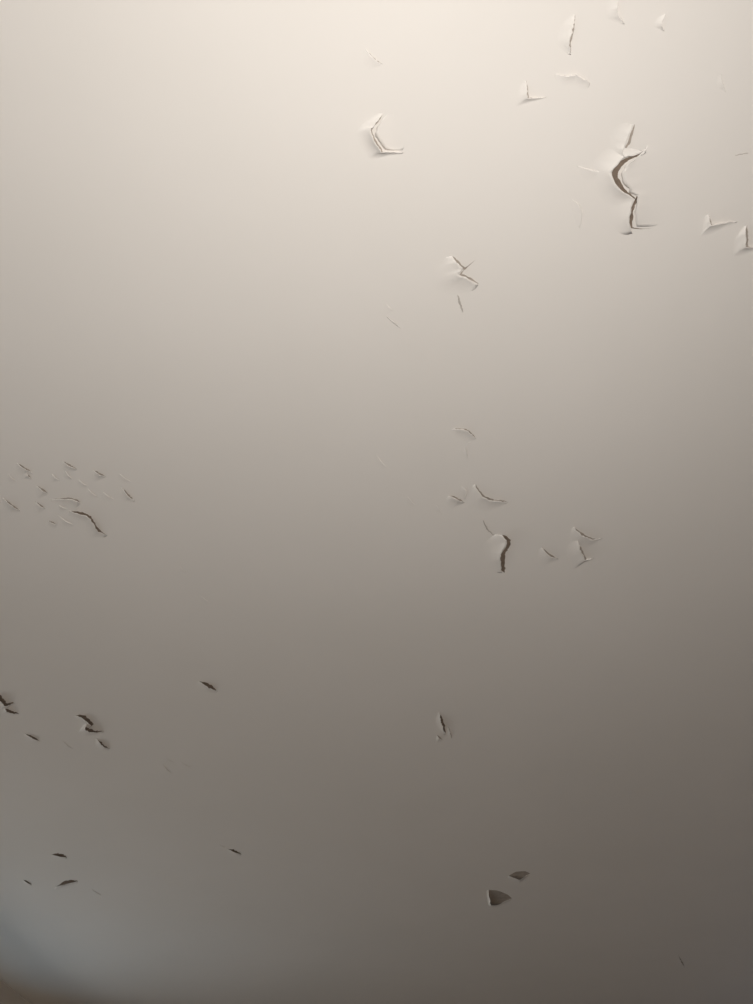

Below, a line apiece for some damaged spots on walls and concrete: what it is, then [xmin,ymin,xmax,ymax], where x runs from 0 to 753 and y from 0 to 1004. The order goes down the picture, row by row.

peeling [356,113,407,159]
peeling [577,123,672,235]
peeling [700,215,753,256]
peeling [430,256,479,312]
peeling [7,461,135,539]
peeling [446,484,511,573]
peeling [0,695,19,717]
peeling [74,715,110,752]
peeling [486,890,512,908]